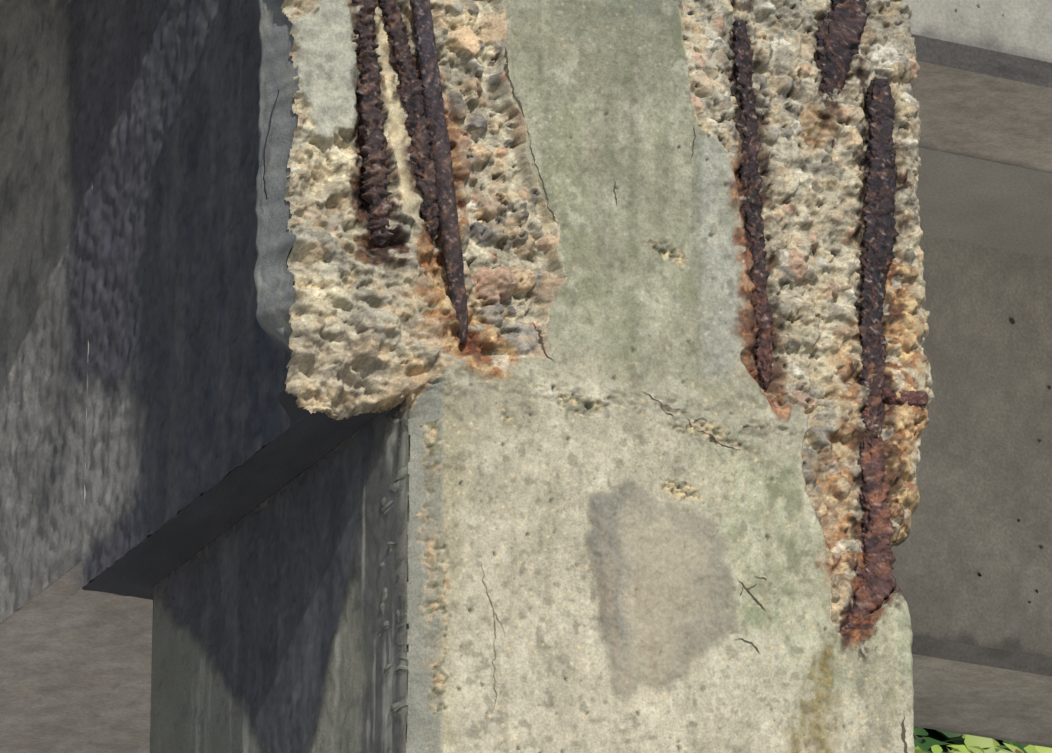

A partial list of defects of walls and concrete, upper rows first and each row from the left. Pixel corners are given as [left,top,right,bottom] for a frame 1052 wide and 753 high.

crack [263,90,279,199]
spalling [281,0,464,420]
rust [349,0,409,124]
rust [350,42,517,378]
spalling [430,0,567,359]
rust [728,0,753,81]
rust [732,102,791,419]
spalling [677,0,935,637]
rust [793,34,929,753]
crack [481,563,505,719]
damp [588,481,735,692]